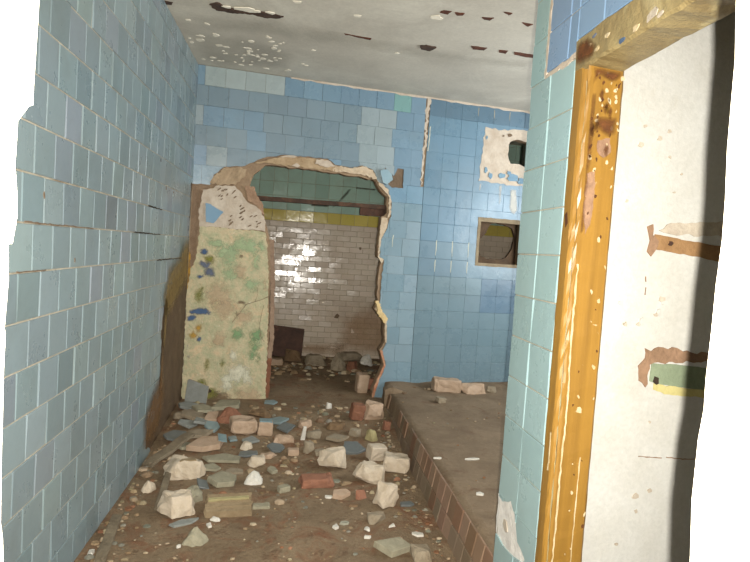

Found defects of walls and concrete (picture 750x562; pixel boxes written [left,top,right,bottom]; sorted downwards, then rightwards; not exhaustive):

spalling [209,2,284,19]
peeling [430,10,465,20]
peeling [188,33,284,69]
spalling [479,127,527,186]
spalling [256,155,404,263]
peeling [646,221,724,262]
spalling [372,300,407,407]
peeling [638,347,709,398]
spalling [496,494,525,562]